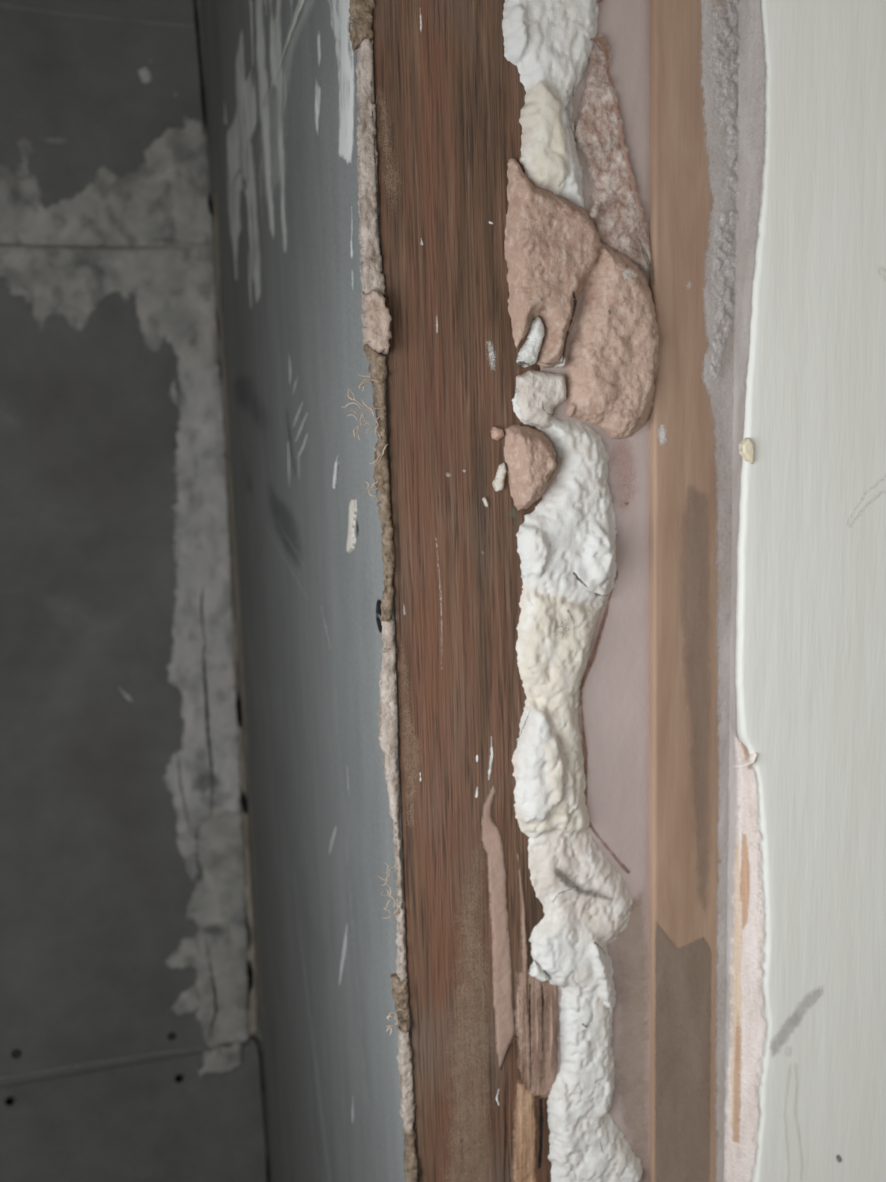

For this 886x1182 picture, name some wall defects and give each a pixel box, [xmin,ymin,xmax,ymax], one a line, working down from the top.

peeling [346,498,358,553]
spalling [348,0,420,1182]
peeling [579,578,616,805]
peeling [654,0,769,1182]
peeling [589,820,629,874]
spalling [528,984,544,1088]